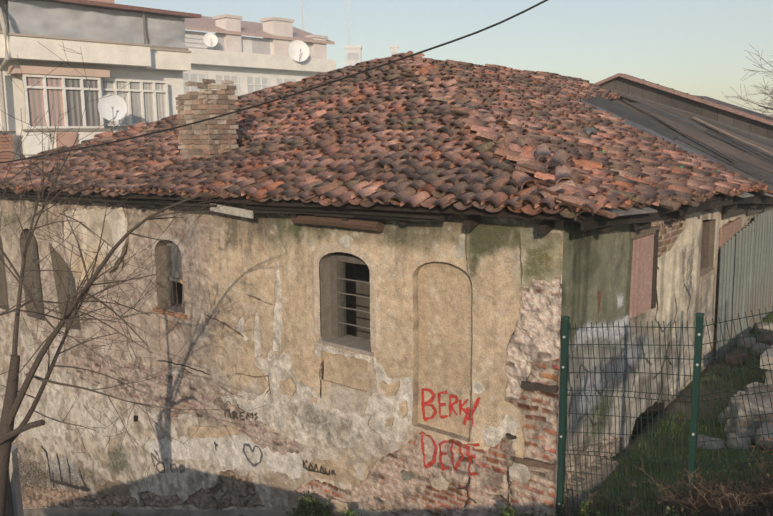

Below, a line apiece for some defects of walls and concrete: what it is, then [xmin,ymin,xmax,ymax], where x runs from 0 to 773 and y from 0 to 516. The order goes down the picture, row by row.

spalling [634,210,686,258]
spalling [11,262,714,516]